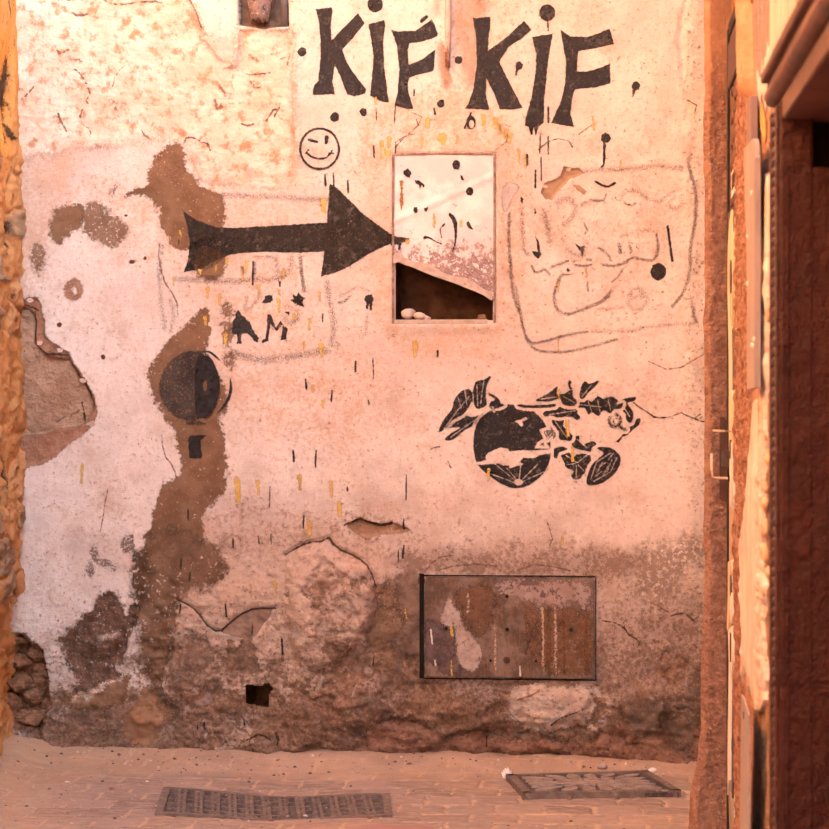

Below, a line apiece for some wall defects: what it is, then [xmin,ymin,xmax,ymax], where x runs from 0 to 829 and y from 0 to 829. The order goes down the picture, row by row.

spalling [0,55,8,109]
flaking render [2,0,297,189]
flaking render [541,167,586,200]
flaking render [19,297,98,468]
leakage [61,302,237,748]
crack [285,537,377,597]
flaking render [344,517,410,539]
leakage [629,531,705,605]
crack [177,598,276,632]
leakage [361,583,405,672]
spalling [7,632,53,739]
leakage [621,664,701,757]